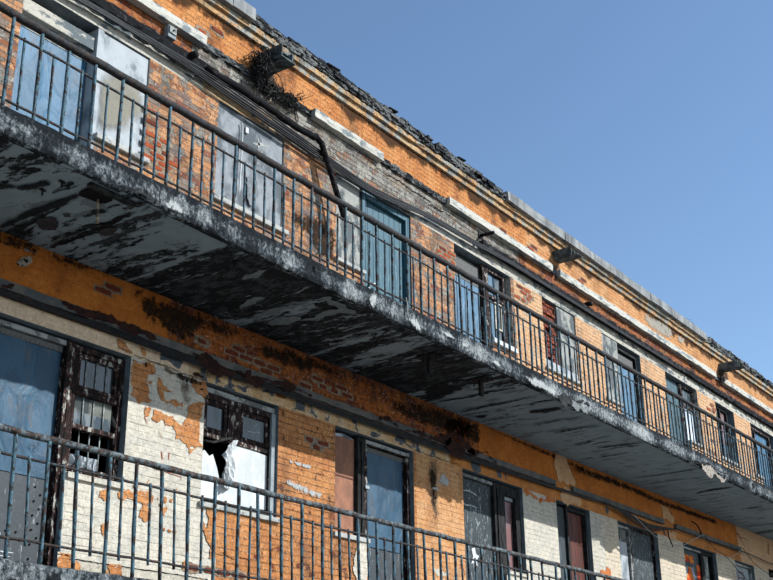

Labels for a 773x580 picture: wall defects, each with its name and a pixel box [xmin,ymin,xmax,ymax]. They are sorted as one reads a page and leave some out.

peeling [35,214,71,231]
spalling [78,182,159,236]
flaking render [247,175,257,207]
mould [135,290,256,341]
peeling [261,286,357,325]
peeling [117,320,210,454]
flaking render [224,343,354,412]
mould [259,346,346,376]
leakage [429,462,449,518]
peeling [523,454,582,506]
spalling [702,464,727,482]
peeling [182,508,254,580]